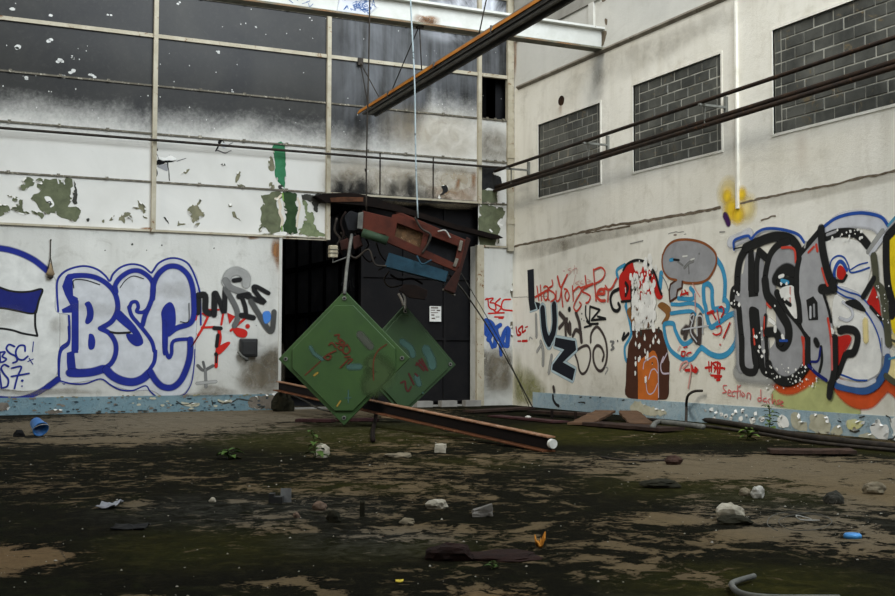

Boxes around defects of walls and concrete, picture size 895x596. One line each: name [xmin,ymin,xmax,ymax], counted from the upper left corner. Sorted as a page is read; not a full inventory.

peeling [0,176,90,222]
peeling [102,200,148,223]
peeling [164,197,205,227]
peeling [258,142,325,237]
water stain [333,183,368,194]
peeling [703,408,765,424]
peeling [777,412,895,440]